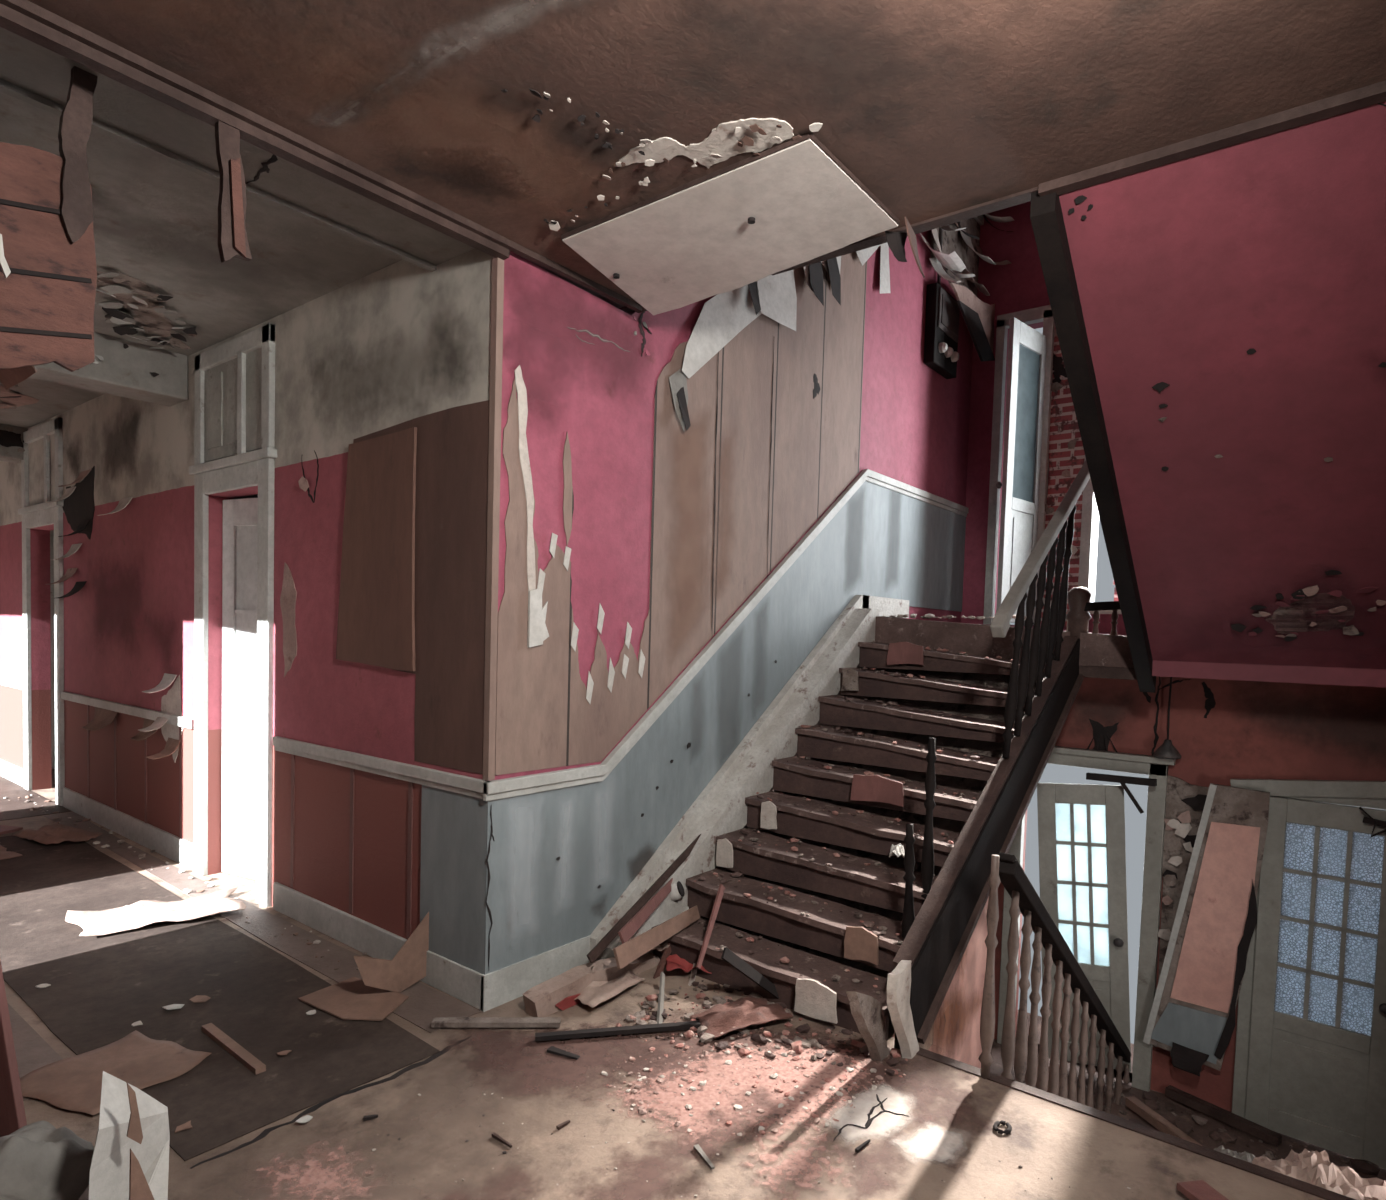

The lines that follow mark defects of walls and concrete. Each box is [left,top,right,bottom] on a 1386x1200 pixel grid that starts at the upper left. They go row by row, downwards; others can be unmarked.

peeling [529,89,823,231]
peeling [95,271,197,350]
flaking render [920,214,1014,362]
peeling [0,428,26,453]
peeling [1231,570,1386,642]
flaking render [1155,775,1209,994]